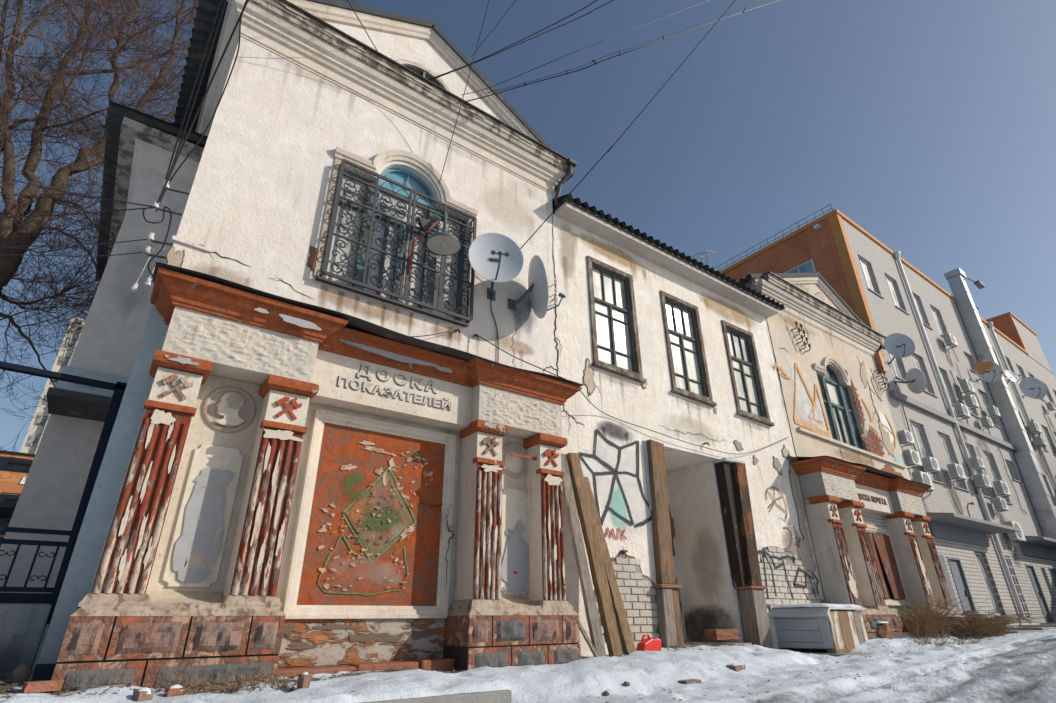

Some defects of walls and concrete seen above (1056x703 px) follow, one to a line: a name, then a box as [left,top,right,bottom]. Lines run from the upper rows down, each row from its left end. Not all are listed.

crack [199,244,314,300]
peeling [254,307,322,331]
crack [543,214,562,375]
peeling [109,461,154,582]
peeling [145,409,176,474]
peeling [242,429,304,588]
peeling [318,440,433,592]
peeling [483,491,529,596]
peeling [544,474,563,486]
peeling [548,505,565,586]
spalling [759,445,825,610]
spalling [611,550,659,651]